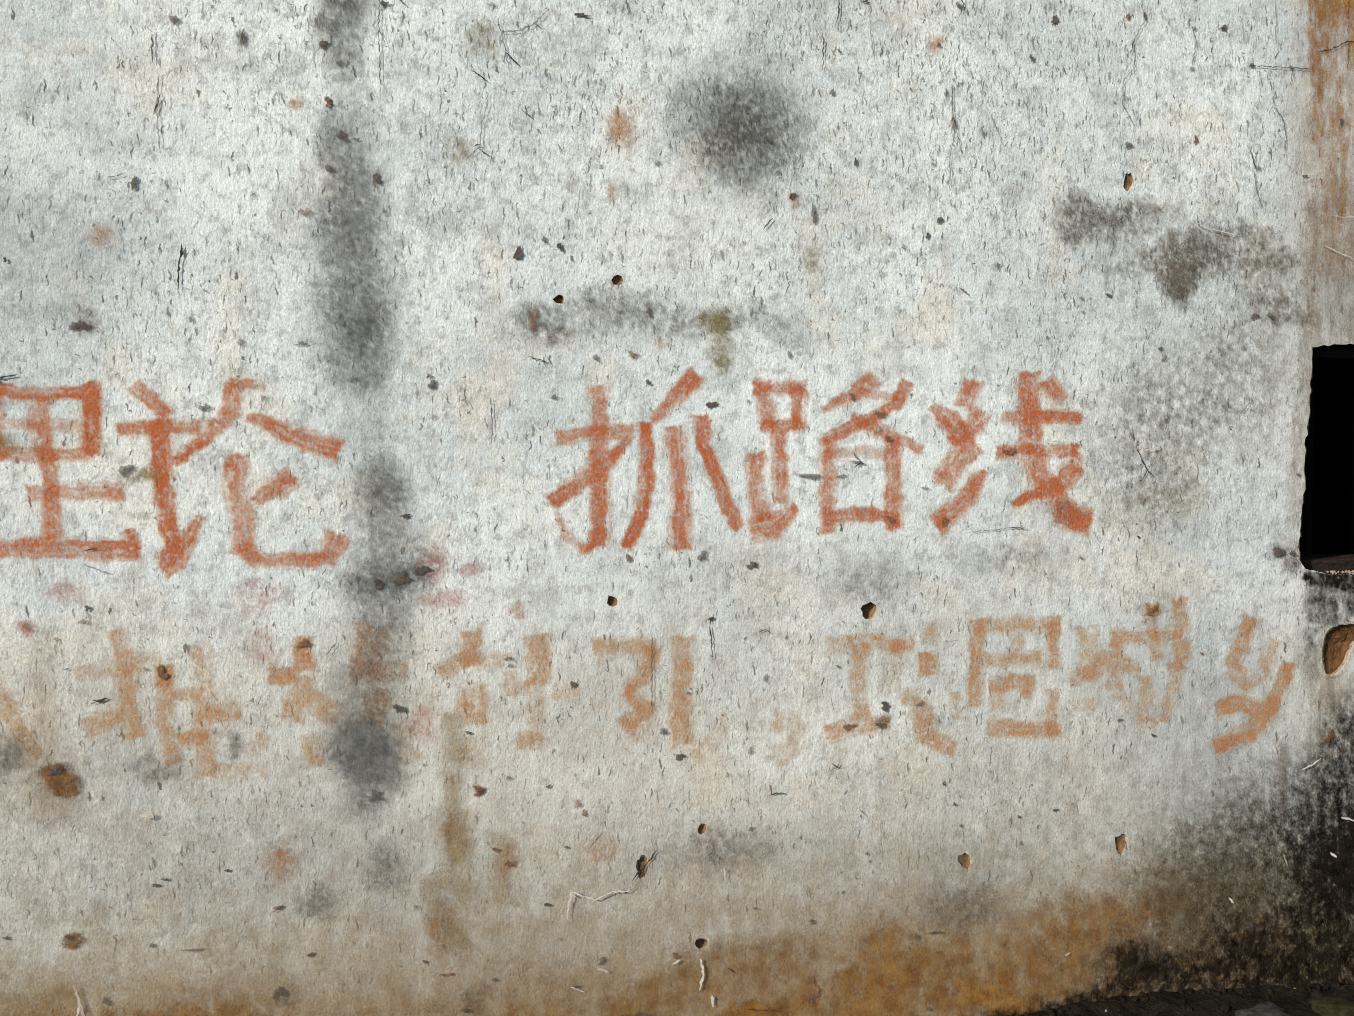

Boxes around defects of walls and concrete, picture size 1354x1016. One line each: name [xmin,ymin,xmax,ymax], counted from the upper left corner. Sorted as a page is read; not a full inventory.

rust [1308,0,1354,133]
damp [319,125,387,388]
damp [1058,193,1298,302]
damp [1257,293,1311,324]
damp [330,469,423,807]
damp [1277,547,1354,647]
flaking render [1321,623,1354,678]
damp [0,714,1354,1016]